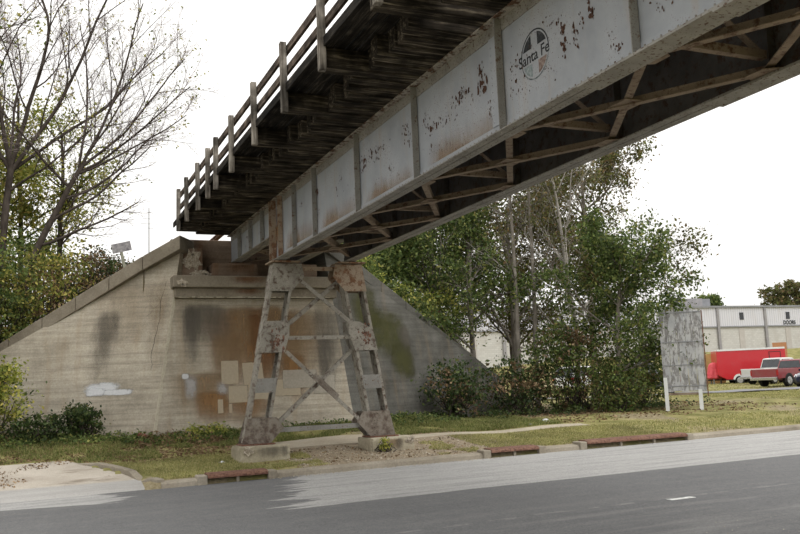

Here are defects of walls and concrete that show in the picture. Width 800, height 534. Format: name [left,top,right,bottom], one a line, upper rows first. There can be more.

rust [219,308,310,372]